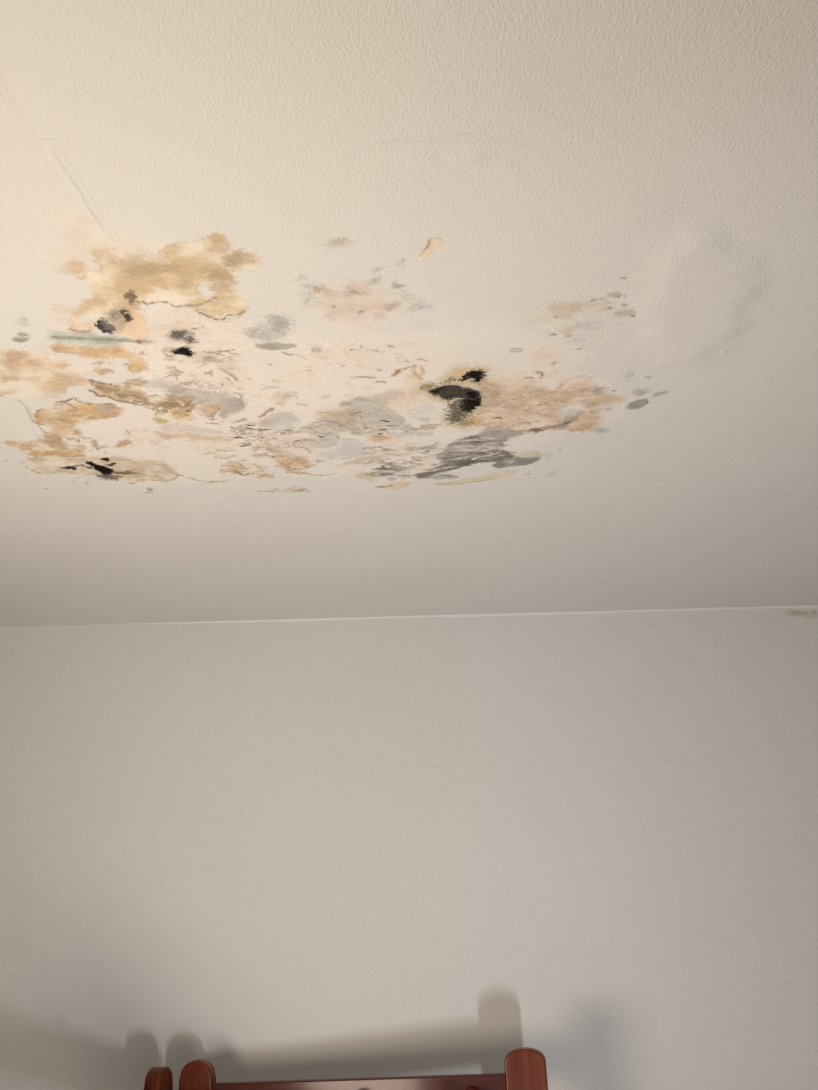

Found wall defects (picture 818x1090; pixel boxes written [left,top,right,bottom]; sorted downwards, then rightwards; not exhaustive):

peeling [202,412,330,461]
water stain [0,233,666,492]